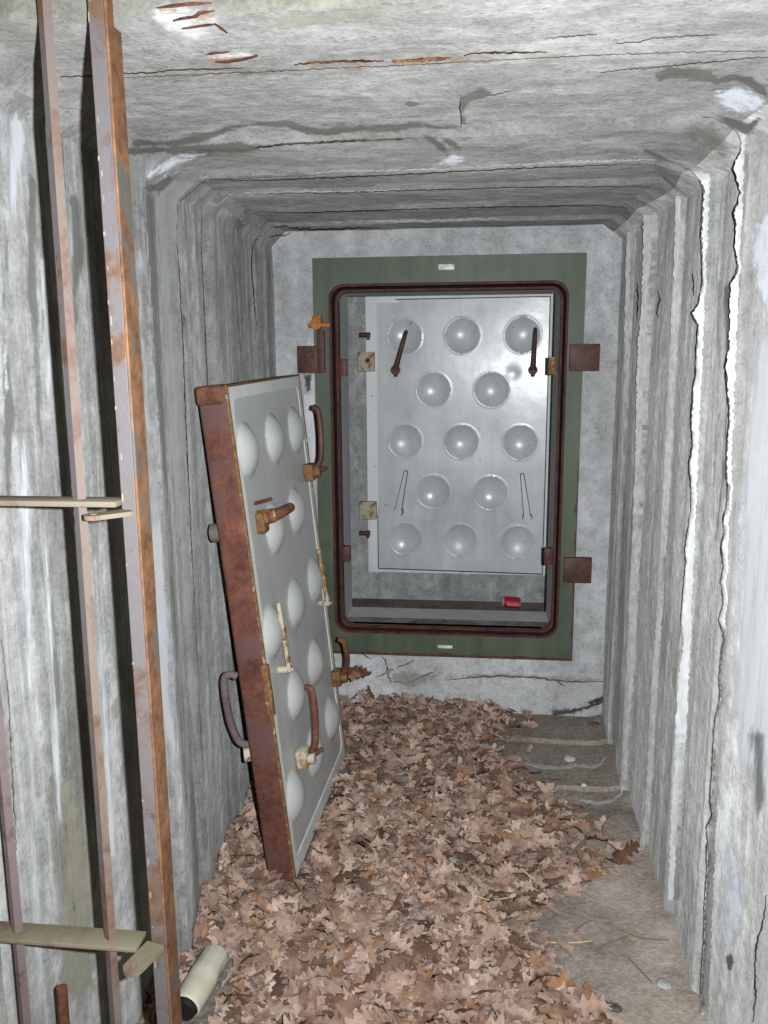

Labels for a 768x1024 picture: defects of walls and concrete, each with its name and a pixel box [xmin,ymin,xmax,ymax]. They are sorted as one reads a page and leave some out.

crack [124,34,767,78]
crack [459,90,512,127]
damp [656,68,767,134]
crack [176,163,662,793]